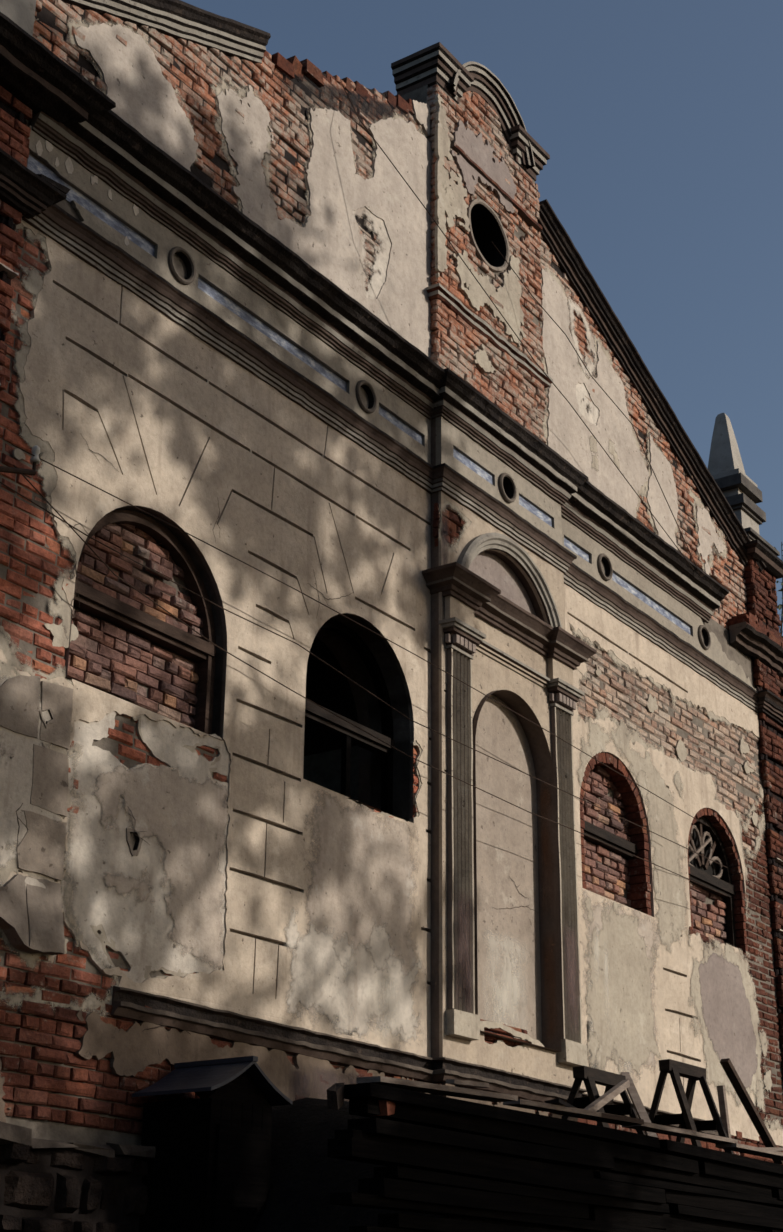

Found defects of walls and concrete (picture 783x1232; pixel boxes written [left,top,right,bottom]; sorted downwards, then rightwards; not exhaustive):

flaking render [0,223,78,685]
flaking render [33,0,427,227]
flaking render [353,206,391,299]
flaking render [539,236,783,648]
flaking render [0,708,230,1016]
flaking render [570,624,783,1131]